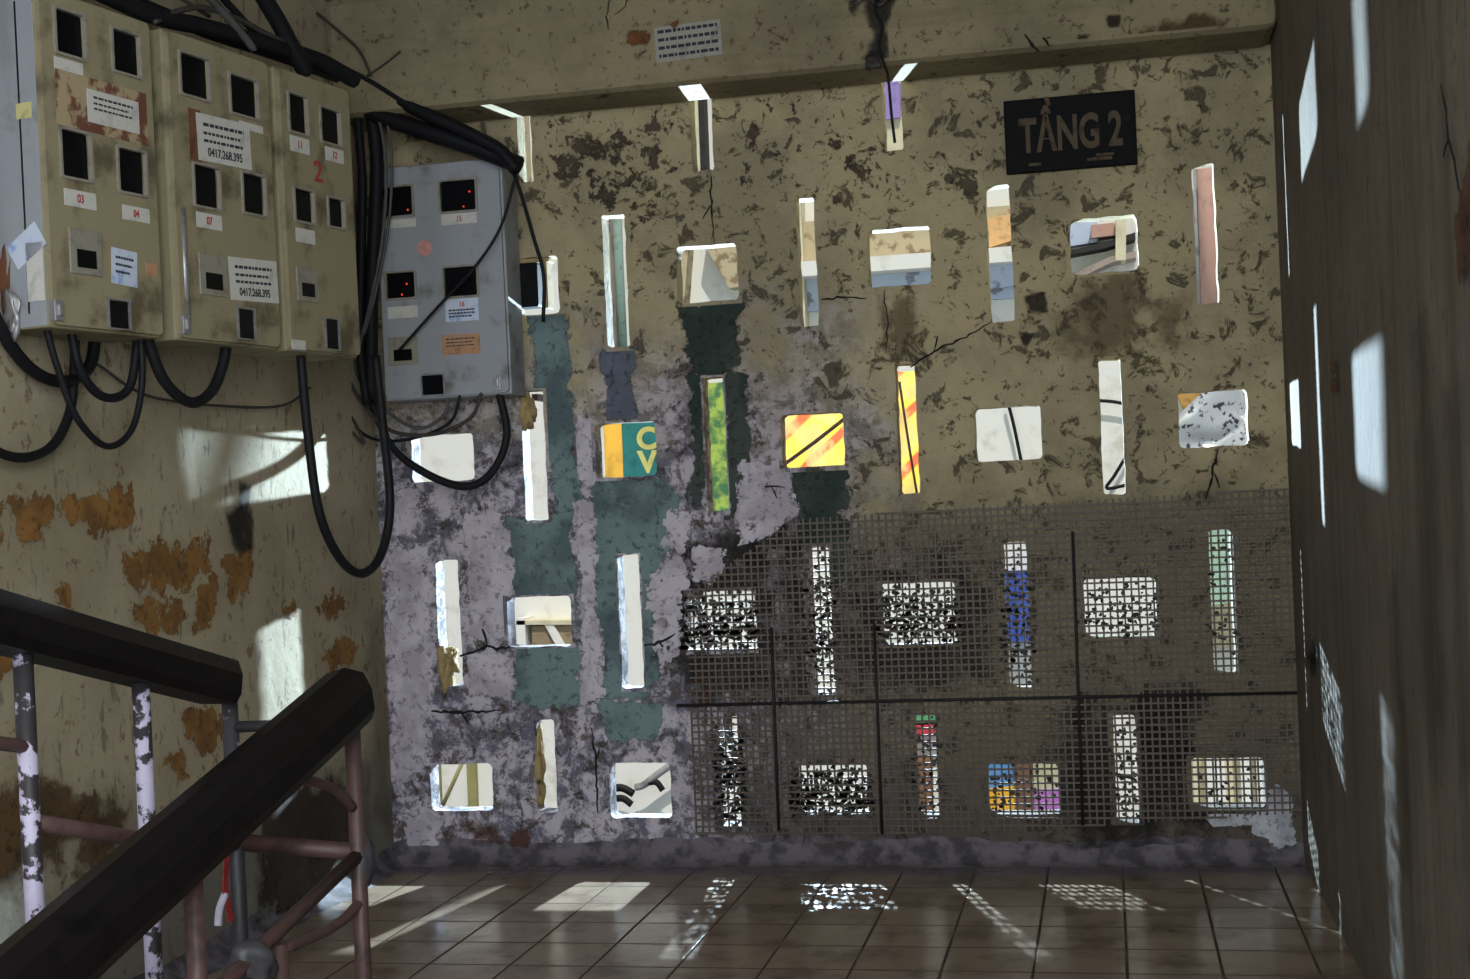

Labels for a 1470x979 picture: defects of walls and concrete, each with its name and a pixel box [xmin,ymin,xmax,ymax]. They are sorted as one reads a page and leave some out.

peeling [0,481,137,545]
peeling [121,482,254,636]
peeling [457,314,800,744]
peeling [55,581,72,610]
peeling [0,656,13,681]
flaking render [382,486,436,791]
flaking render [402,809,444,846]